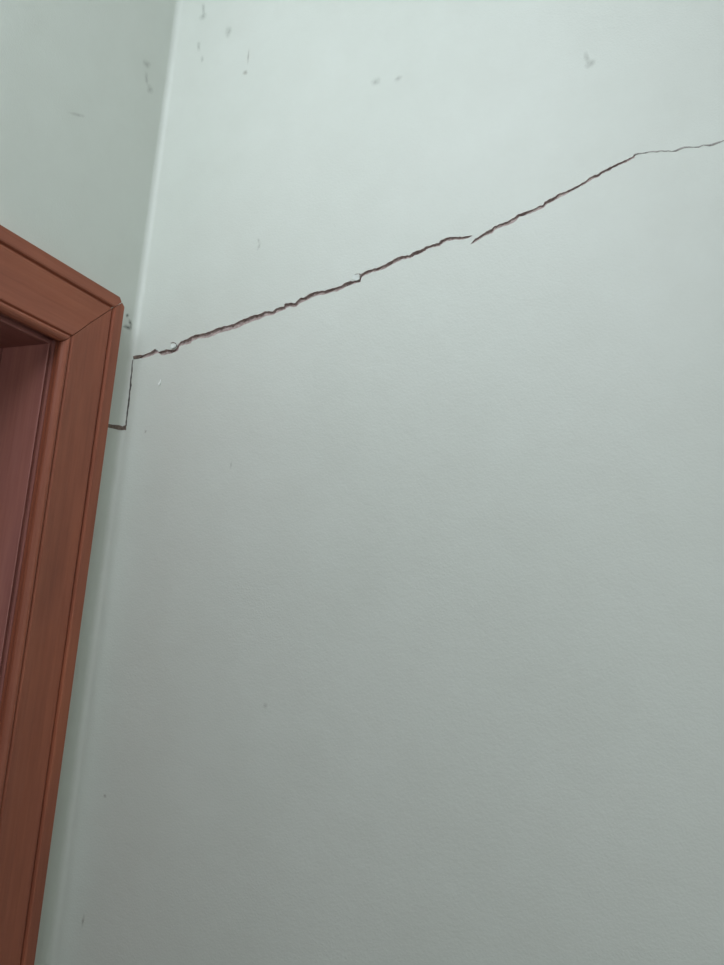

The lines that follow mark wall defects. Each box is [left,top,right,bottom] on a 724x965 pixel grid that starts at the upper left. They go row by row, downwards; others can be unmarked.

crack [108,140,724,430]